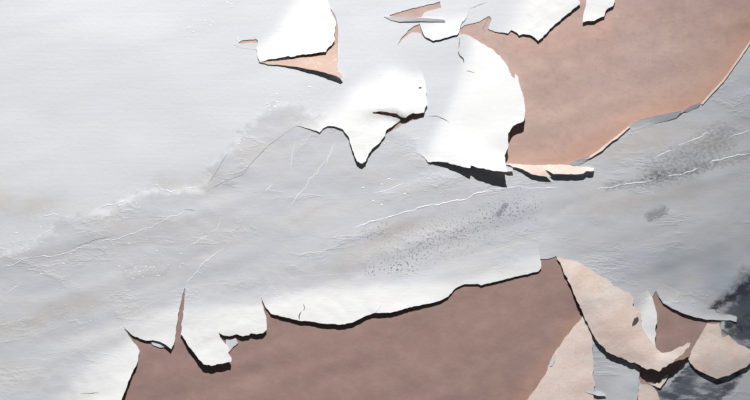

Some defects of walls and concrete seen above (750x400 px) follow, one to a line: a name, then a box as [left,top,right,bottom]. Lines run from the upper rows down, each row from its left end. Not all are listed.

peeling [235,0,750,177]
crack [152,130,294,192]
crack [596,130,750,190]
crack [353,185,556,228]
crack [3,209,194,267]
peeling [34,243,750,400]
water stain [711,276,750,348]
water stain [654,368,741,400]